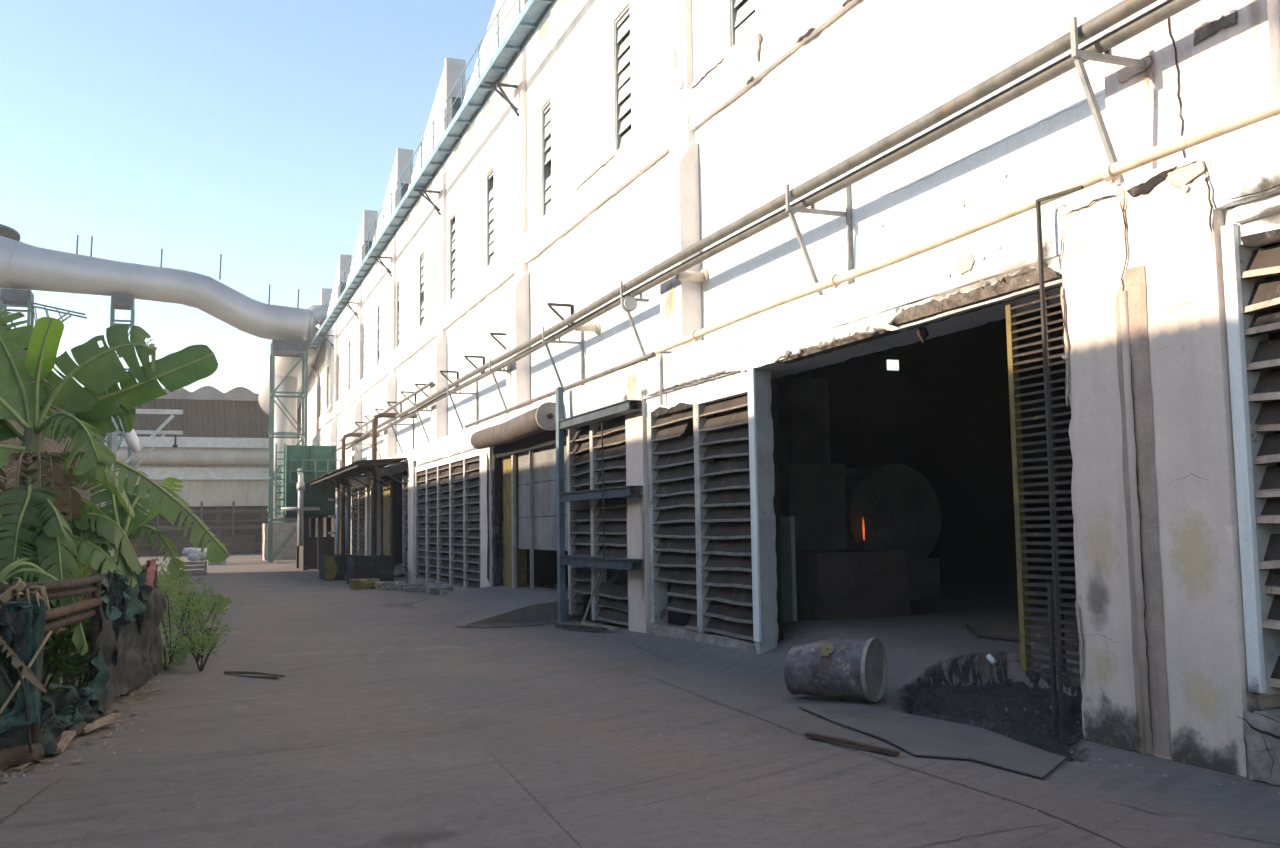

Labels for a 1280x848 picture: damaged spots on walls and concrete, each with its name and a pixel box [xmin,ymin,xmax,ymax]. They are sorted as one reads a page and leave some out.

spalling [1193,8,1238,46]
spalling [746,33,762,85]
spalling [1116,54,1154,84]
crack [1168,18,1280,250]
spalling [1127,159,1206,197]
crack [1057,190,1128,291]
spalling [774,245,1070,408]
water stain [1085,697,1141,753]
crack [1237,716,1280,777]